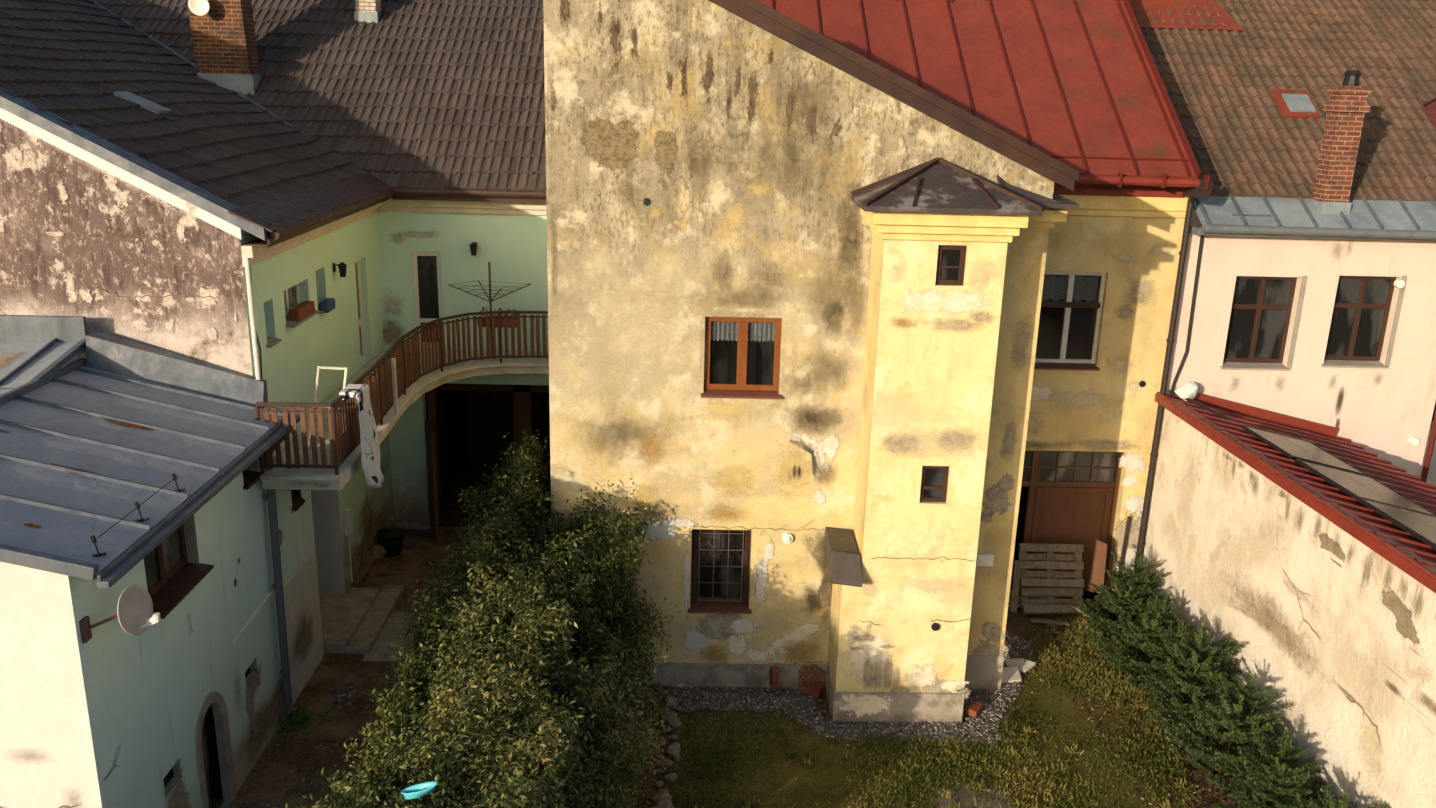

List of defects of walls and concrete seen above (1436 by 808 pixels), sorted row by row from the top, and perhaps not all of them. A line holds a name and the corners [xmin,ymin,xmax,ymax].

leakage [558,0,571,29]
leakage [597,0,637,74]
leakage [666,48,773,133]
leakage [102,172,121,195]
leakage [839,204,860,270]
peeling [896,268,993,315]
rust [104,418,156,430]
leakage [795,410,834,431]
peeling [779,432,840,505]
peeling [980,473,1014,523]
spalling [625,517,821,664]
peeling [798,626,970,718]